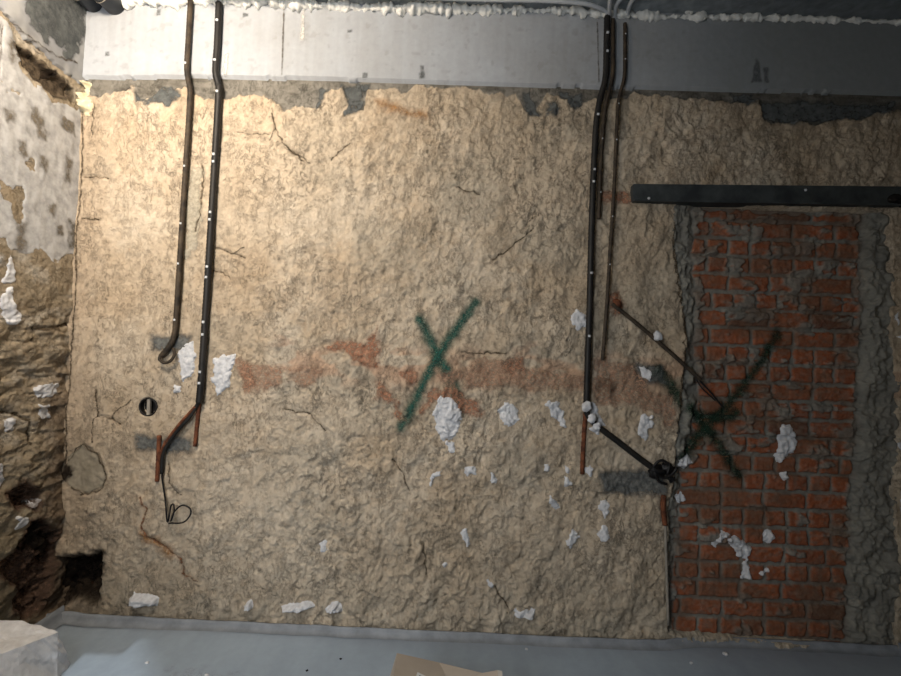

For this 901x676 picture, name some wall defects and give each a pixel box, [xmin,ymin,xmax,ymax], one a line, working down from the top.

flaking render [0,16,81,325]
crack [238,113,307,162]
crack [30,107,131,496]
crack [0,411,32,445]
spalling [0,463,62,619]